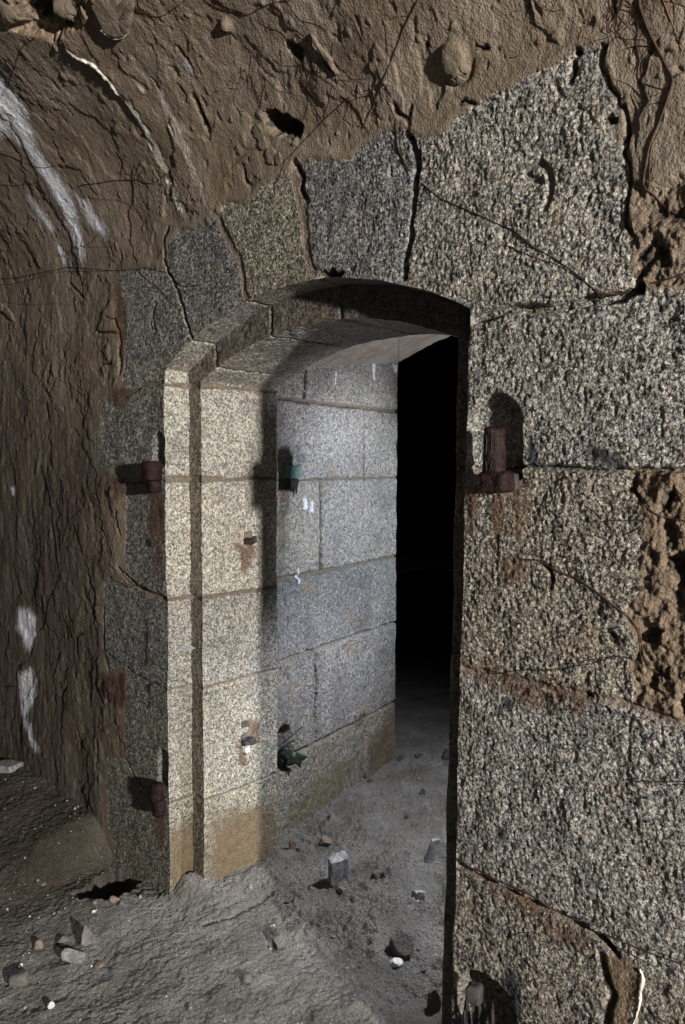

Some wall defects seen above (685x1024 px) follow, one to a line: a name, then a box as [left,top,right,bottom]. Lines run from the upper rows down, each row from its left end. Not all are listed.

spalling [661,491,675,508]
spalling [667,523,685,609]
spalling [648,603,664,643]